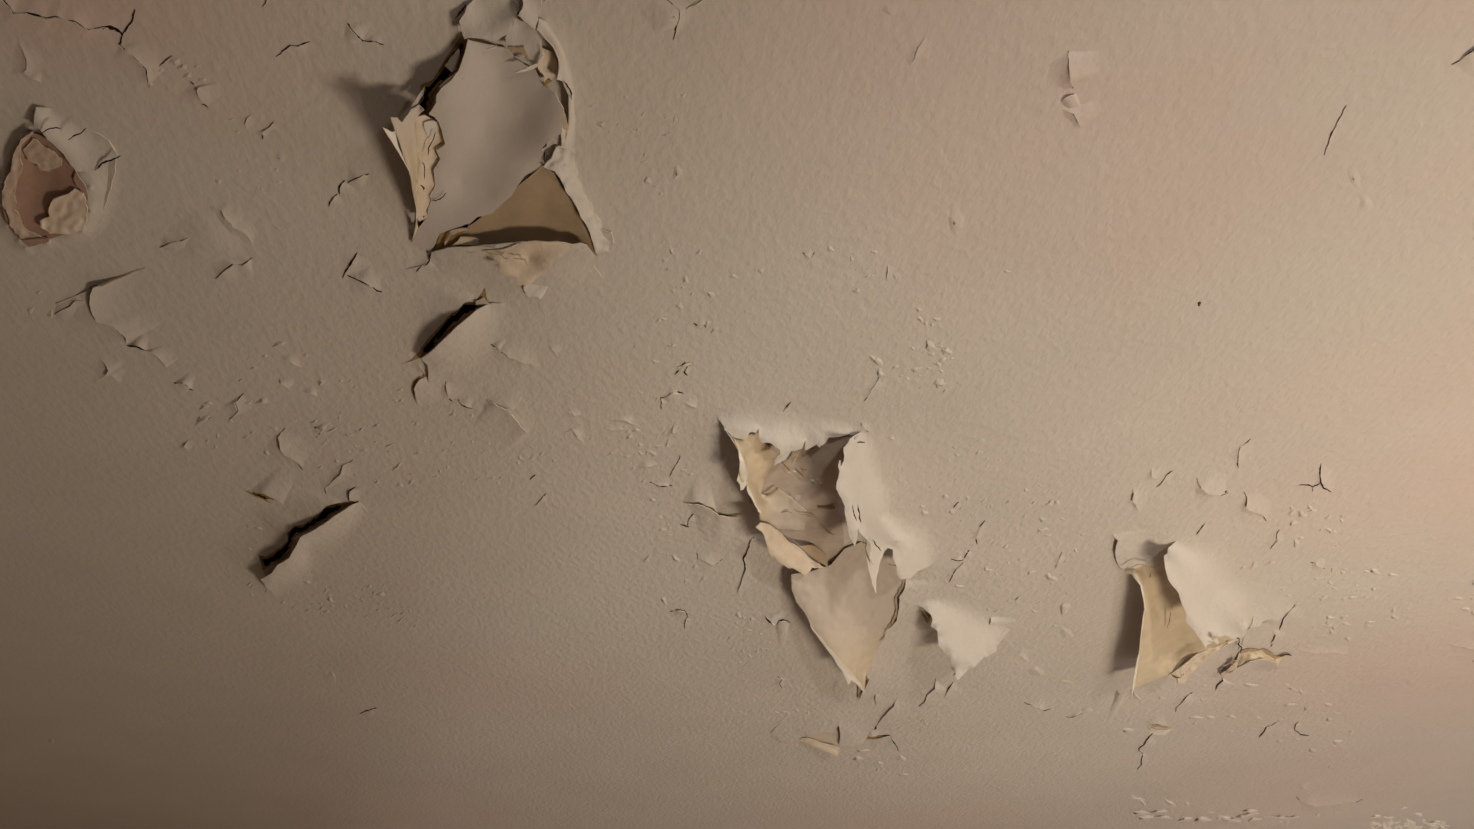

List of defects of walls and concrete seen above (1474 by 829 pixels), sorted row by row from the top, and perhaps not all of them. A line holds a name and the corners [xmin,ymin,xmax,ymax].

flaking render [0,107,123,257]
peeling [383,0,614,408]
peeling [56,268,179,383]
peeling [660,362,699,409]
peeling [243,421,368,597]
peeling [681,402,1017,757]
peeling [1106,468,1295,725]